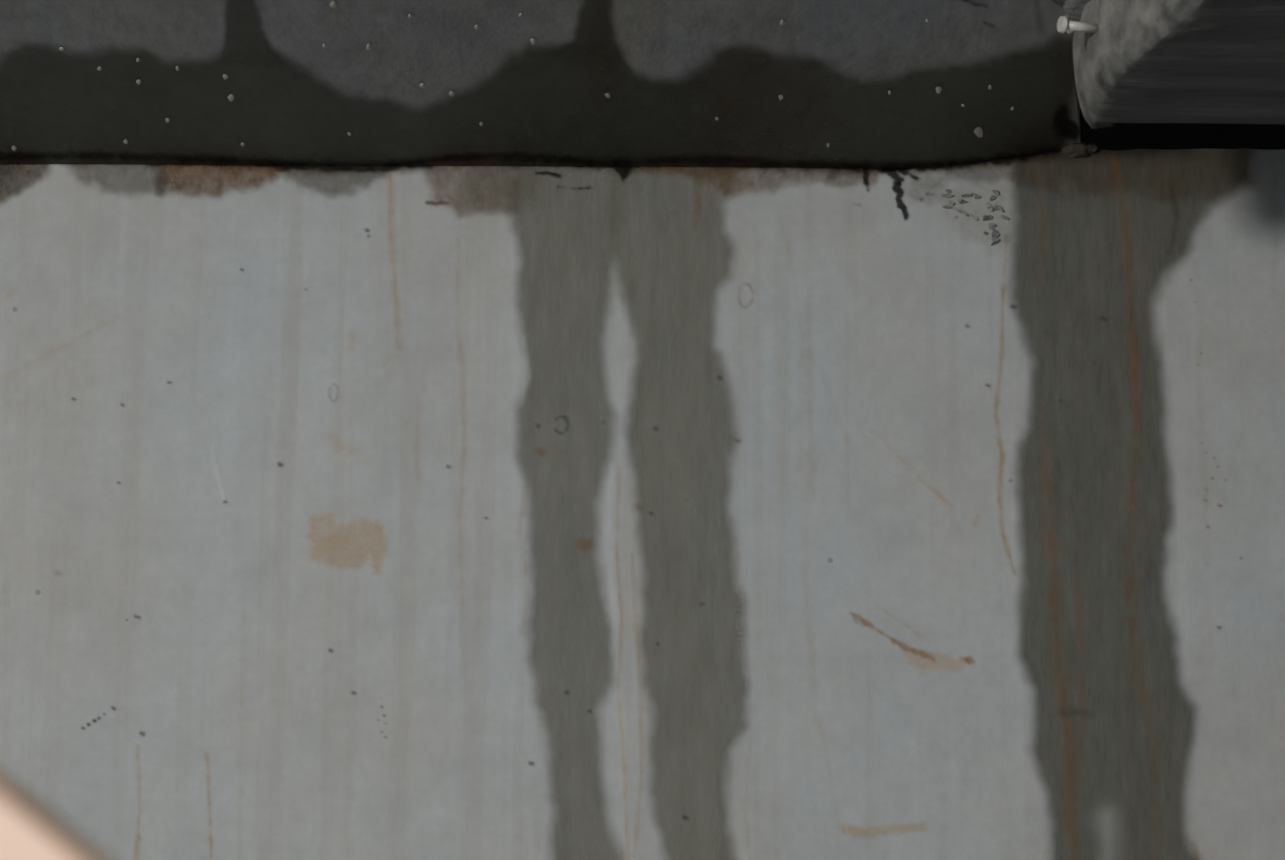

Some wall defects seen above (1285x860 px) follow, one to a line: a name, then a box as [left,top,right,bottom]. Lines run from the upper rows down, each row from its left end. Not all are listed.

water stain [0,0,1075,168]
water stain [515,164,618,860]
water stain [613,166,746,860]
water stain [1015,148,1251,860]